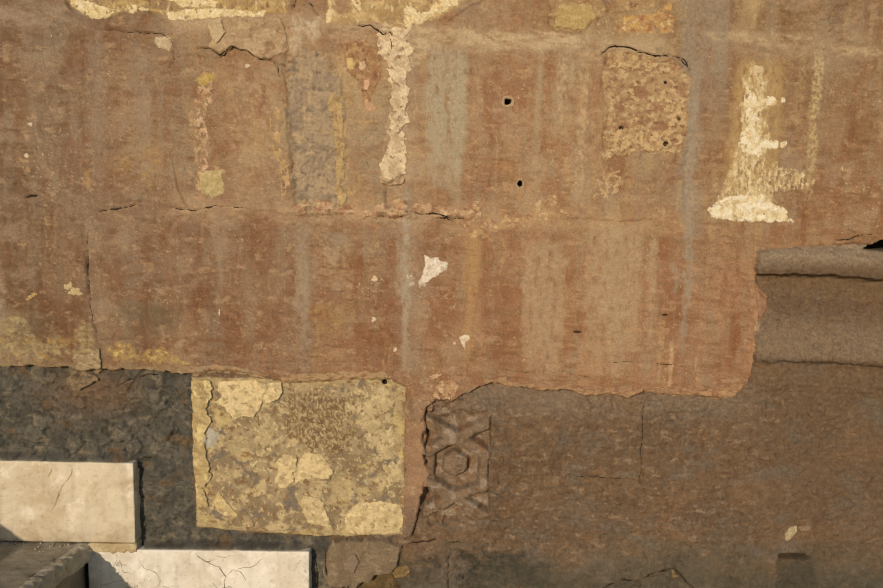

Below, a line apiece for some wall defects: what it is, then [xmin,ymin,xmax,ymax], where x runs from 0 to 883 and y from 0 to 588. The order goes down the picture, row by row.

spalling [548,0,674,35]
crack [198,47,279,73]
spalling [63,0,572,239]
peeling [707,60,828,223]
peeling [64,281,83,295]
peeling [0,291,460,588]
crack [92,562,174,588]
crack [195,554,264,588]
crack [604,568,694,588]